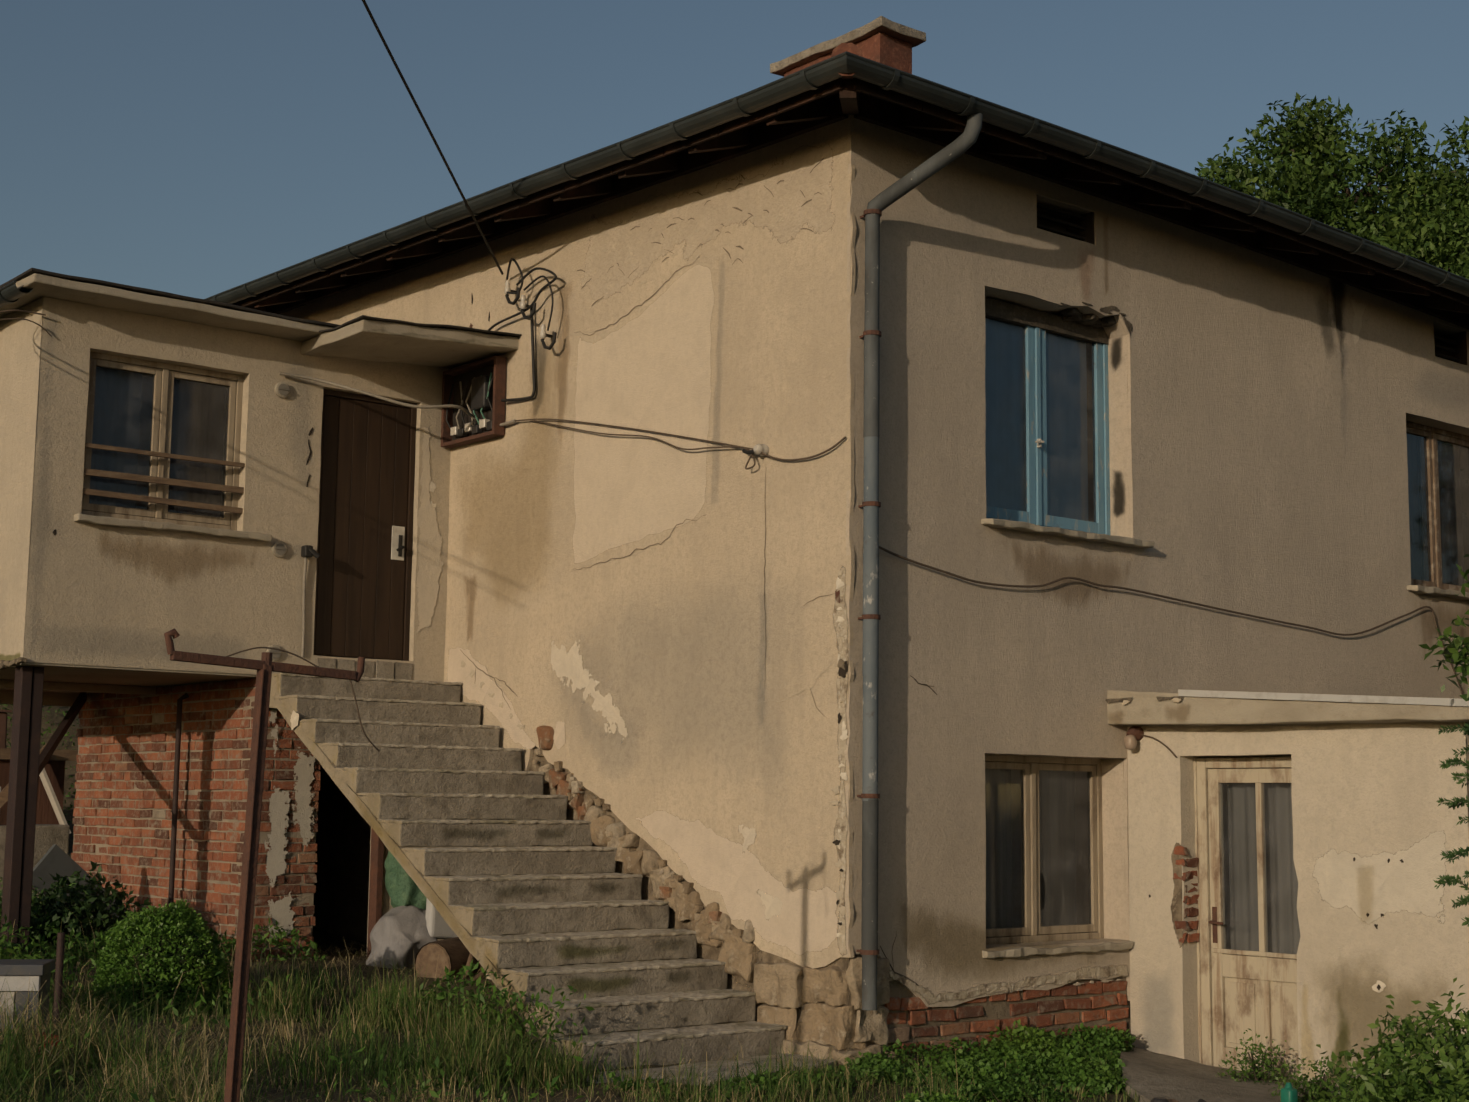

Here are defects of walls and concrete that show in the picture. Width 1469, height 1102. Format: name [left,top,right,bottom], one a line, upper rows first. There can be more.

crack [574,514,707,570]
peeling [269,708,299,756]
peeling [550,640,632,742]
peeling [636,567,849,956]
peeling [264,747,316,940]
flaking render [1171,843,1200,948]
flaking render [889,965,1129,1004]